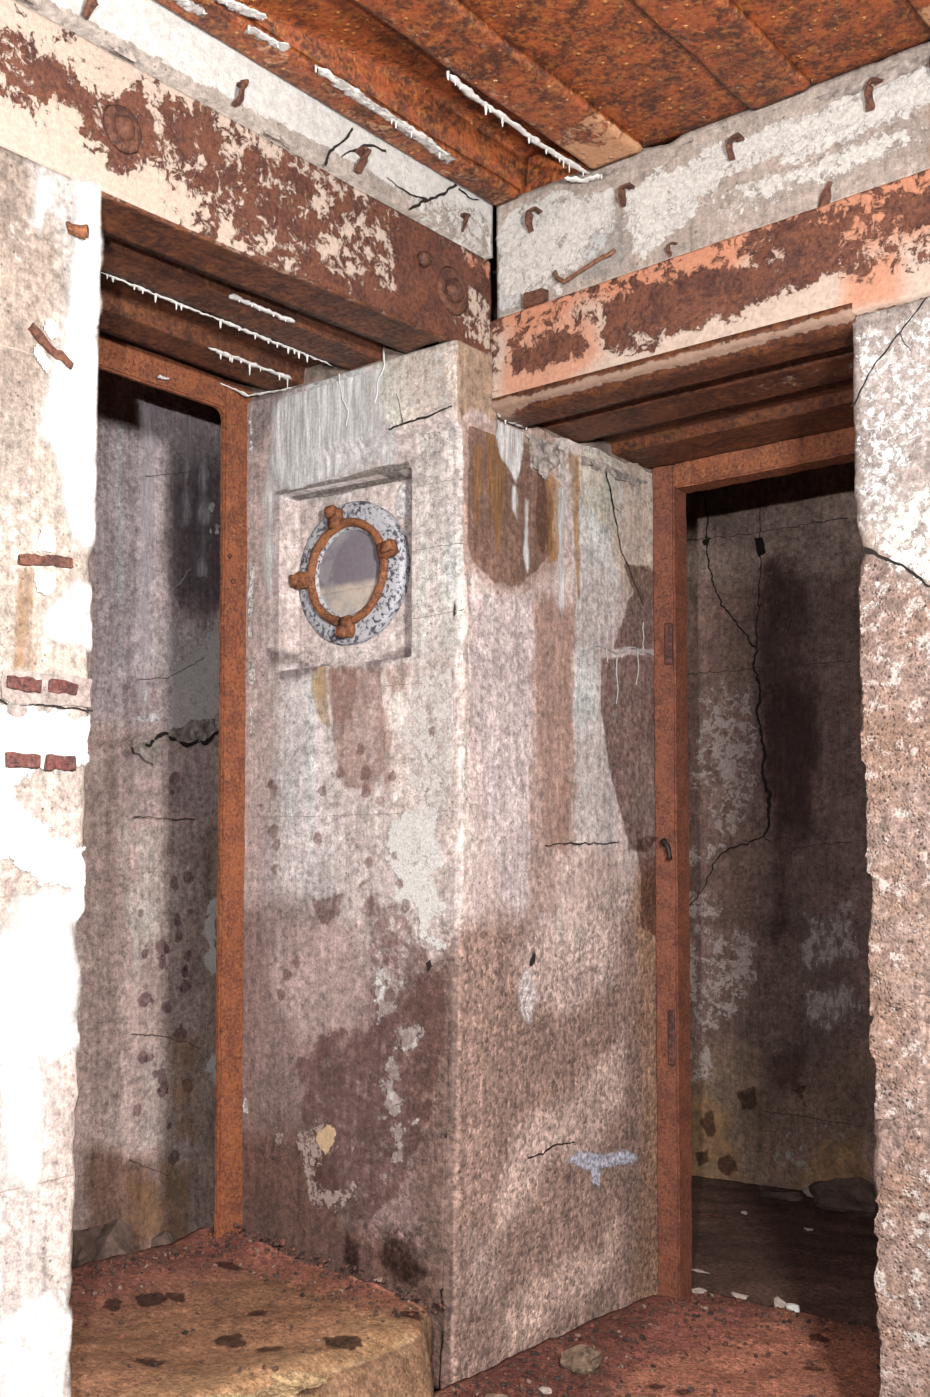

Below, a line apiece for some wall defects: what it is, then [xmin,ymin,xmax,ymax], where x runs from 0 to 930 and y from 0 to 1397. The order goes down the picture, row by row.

leakage [32,175,53,228]
crack [324,128,479,210]
leakage [41,178,397,637]
leakage [137,402,161,722]
leakage [496,413,534,572]
crack [580,472,652,704]
crack [862,547,930,587]
peeling [0,702,90,890]
crack [0,699,93,717]
crack [133,730,219,750]
spalling [856,311,930,1397]
leakage [802,896,861,1030]